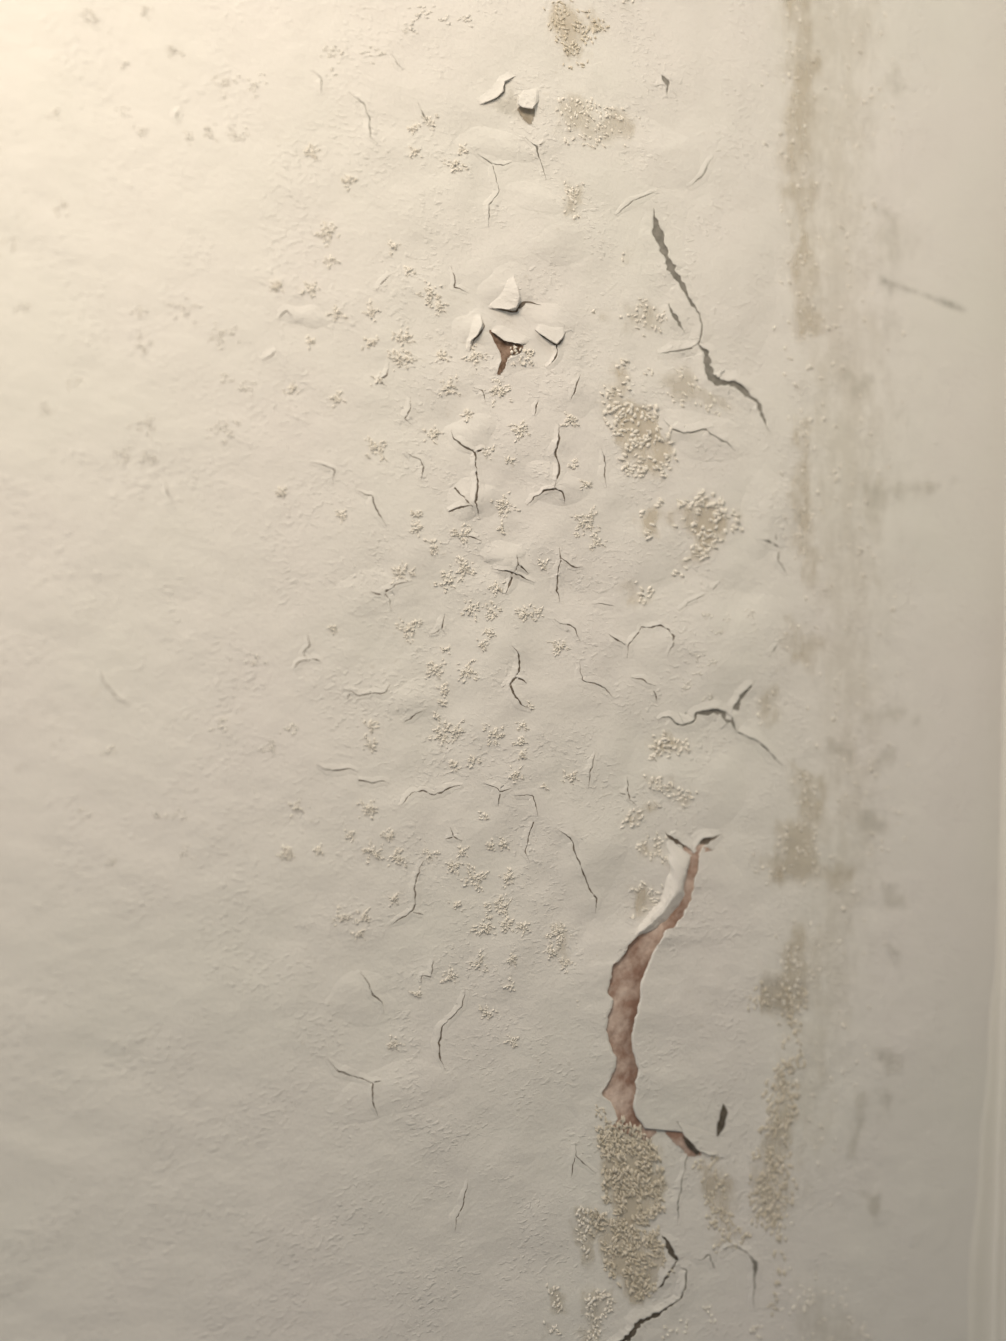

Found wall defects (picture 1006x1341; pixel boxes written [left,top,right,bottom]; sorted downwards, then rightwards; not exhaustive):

peeling [477,72,539,124]
damp [543,0,610,70]
peeling [466,276,566,378]
damp [599,358,730,479]
crack [614,154,777,455]
damp [639,489,744,577]
peeling [549,829,767,1159]
damp [575,1105,675,1341]
crack [606,1153,762,1341]
damp [692,935,871,1341]